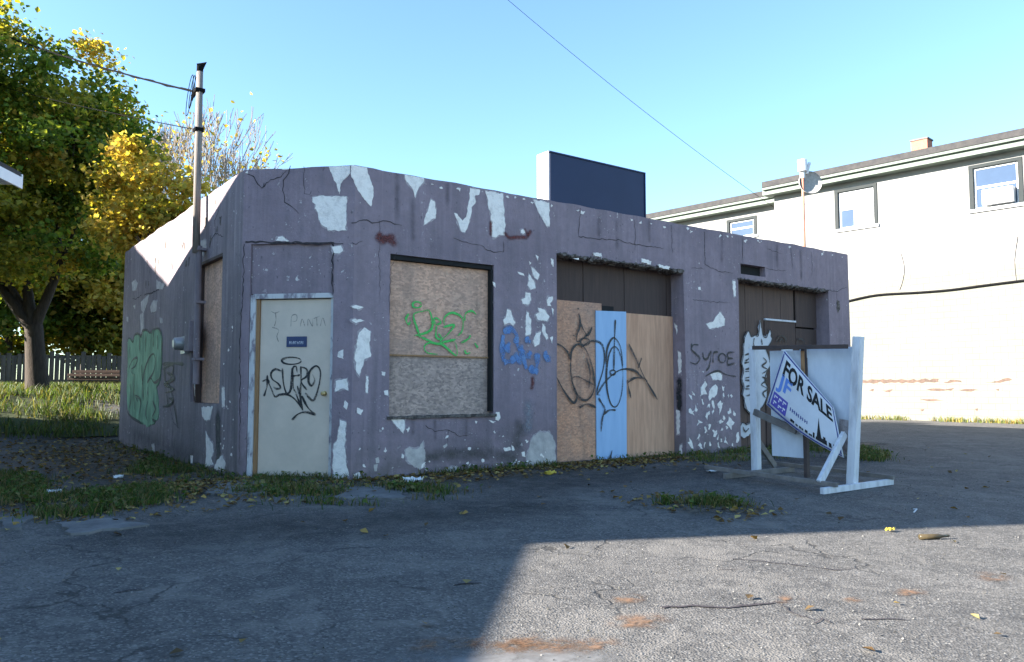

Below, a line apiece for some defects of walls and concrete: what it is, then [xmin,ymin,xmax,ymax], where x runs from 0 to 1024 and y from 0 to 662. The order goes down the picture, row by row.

crack [247,166,312,210]
peeling [312,165,374,232]
peeling [404,175,443,226]
peeling [454,187,553,240]
peeling [503,255,554,347]
peeling [190,386,234,472]
peeling [331,304,387,480]
peeling [401,440,430,471]
peeling [445,412,556,473]
peeling [675,372,739,454]